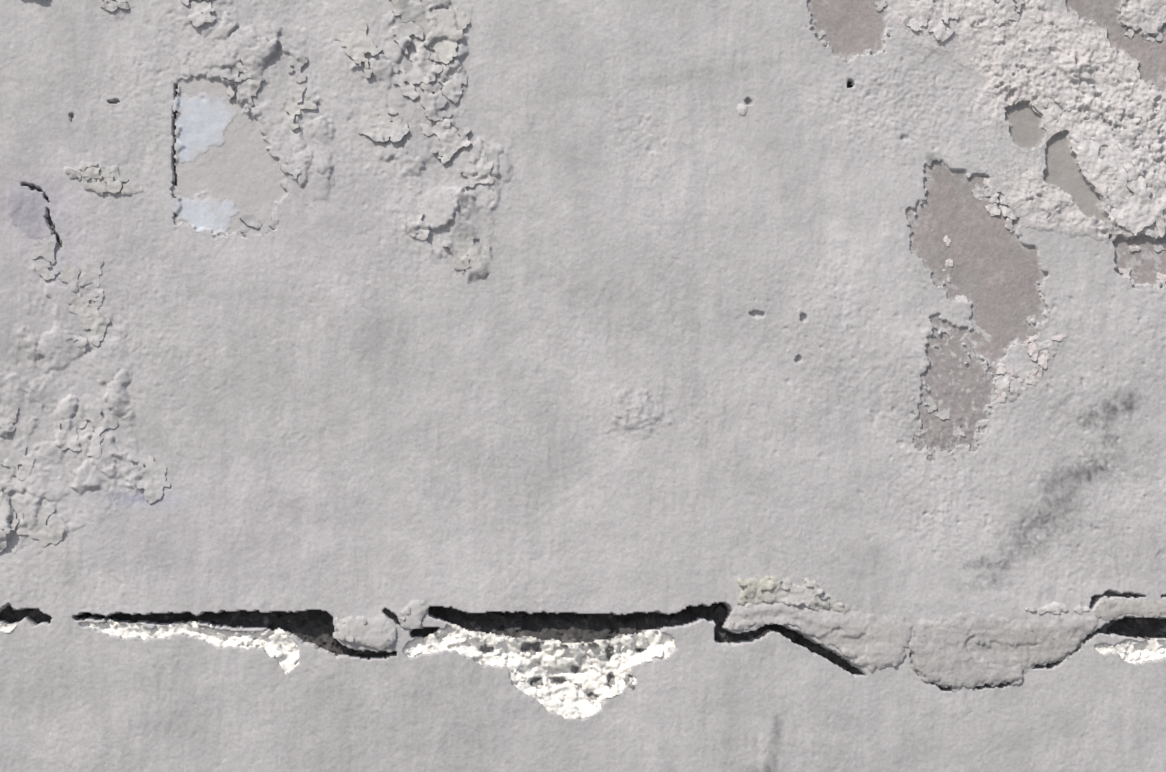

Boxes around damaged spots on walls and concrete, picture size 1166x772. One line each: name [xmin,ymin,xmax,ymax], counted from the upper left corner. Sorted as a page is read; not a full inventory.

flaking render [170,0,337,238]
flaking render [334,0,514,284]
flaking render [806,0,1166,461]
flaking render [0,184,171,555]
flaking render [81,619,299,674]
crack [0,602,863,674]
flaking render [403,624,676,719]
crack [937,682,1009,690]
crack [1090,590,1166,640]
flaking render [1095,639,1166,664]